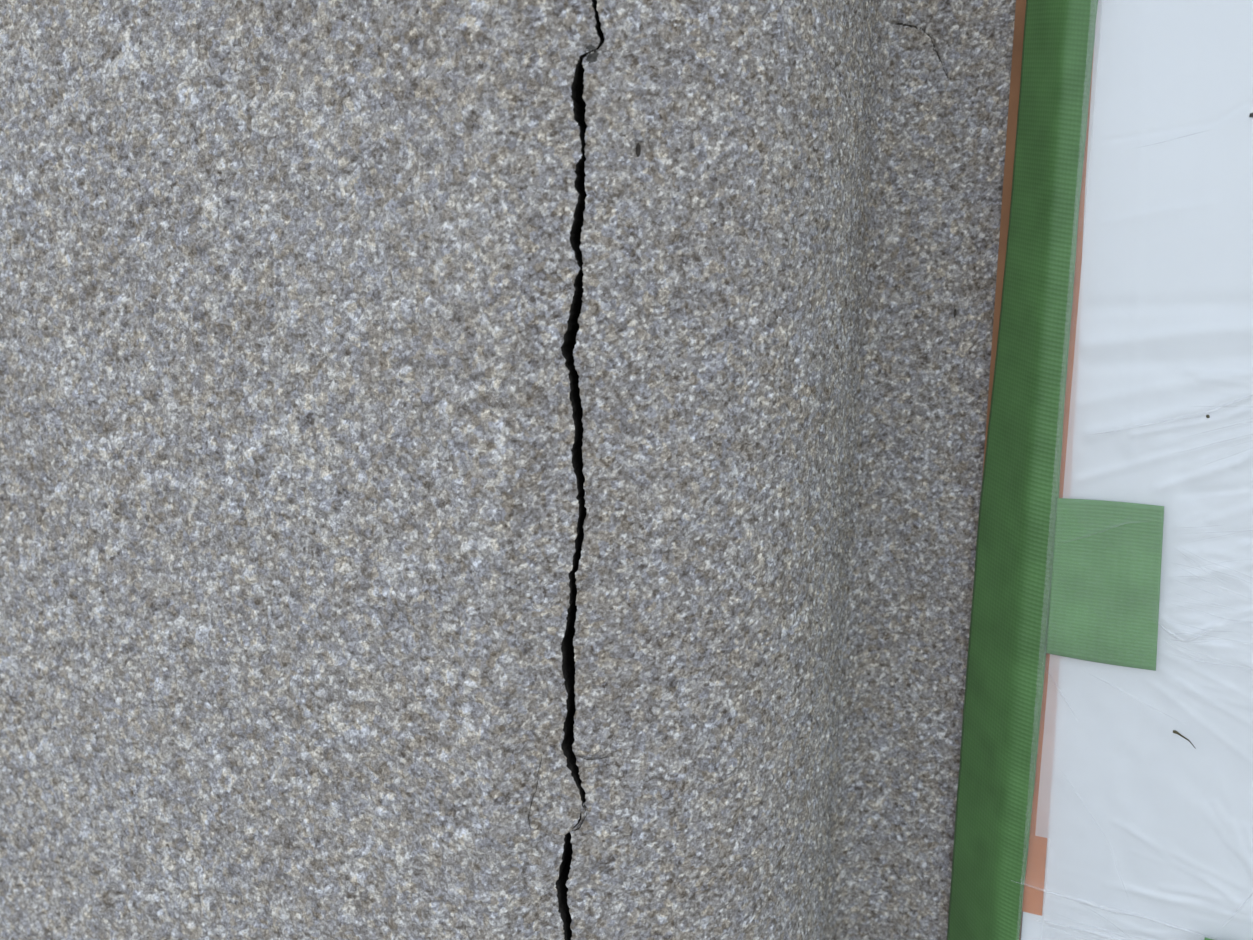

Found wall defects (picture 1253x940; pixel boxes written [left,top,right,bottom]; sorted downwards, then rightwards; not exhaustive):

crack [528,0,606,940]